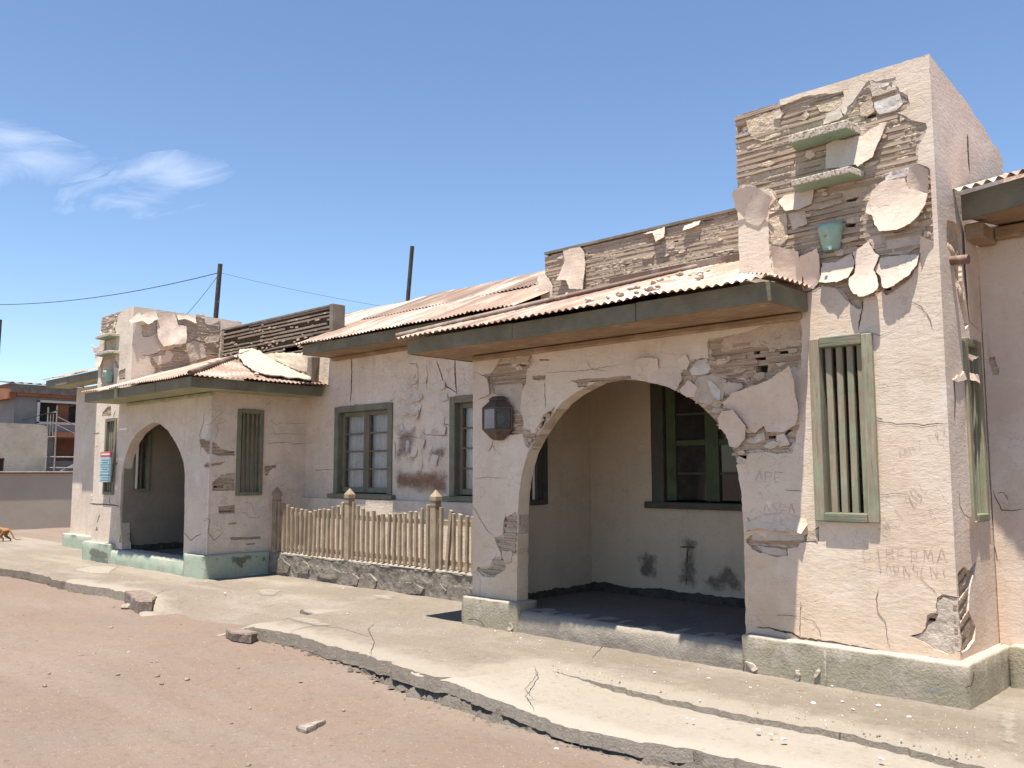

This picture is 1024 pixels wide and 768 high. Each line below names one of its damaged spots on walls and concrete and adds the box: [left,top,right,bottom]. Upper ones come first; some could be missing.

flaking render [732,77,934,309]
flaking render [643,227,665,242]
flaking render [537,247,585,299]
flaking render [91,311,221,386]
flaking render [573,320,802,465]
flaking render [199,439,235,491]
flaking render [477,512,529,577]
flaking render [746,513,819,557]
flaking render [913,568,973,654]